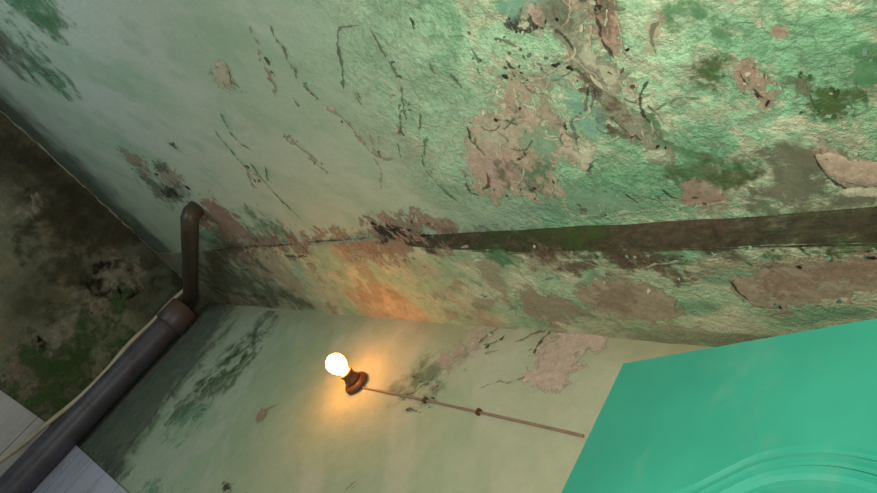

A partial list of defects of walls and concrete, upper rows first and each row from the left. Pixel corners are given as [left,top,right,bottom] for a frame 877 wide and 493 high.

peeling [447,0,675,207]
peeling [690,57,782,109]
peeling [118,145,190,202]
flaking render [811,146,877,198]
flaking render [333,206,469,269]
flaking render [474,249,685,394]